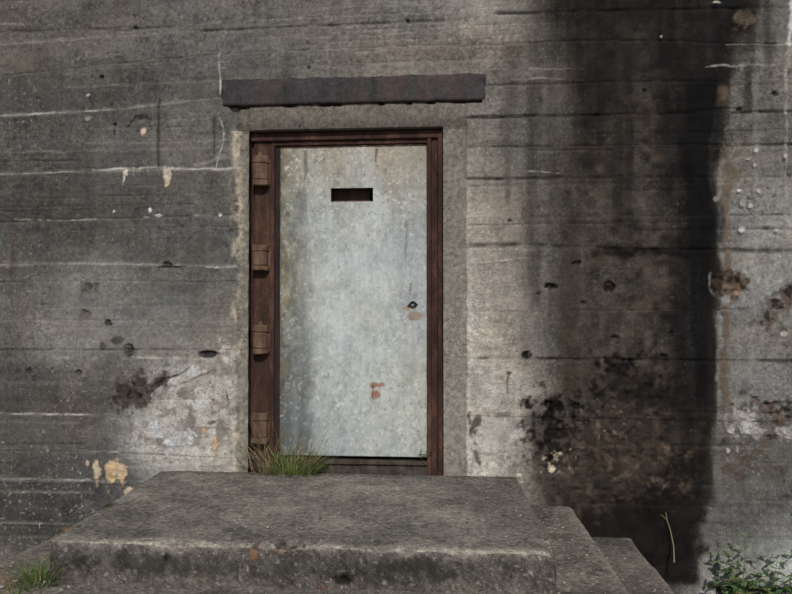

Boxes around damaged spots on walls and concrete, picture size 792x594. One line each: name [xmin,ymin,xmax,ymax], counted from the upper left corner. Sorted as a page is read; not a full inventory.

damp [515,0,759,584]
spalling [709,269,750,302]
spalling [759,285,792,337]
peeling [112,336,247,463]
peeling [85,458,133,494]